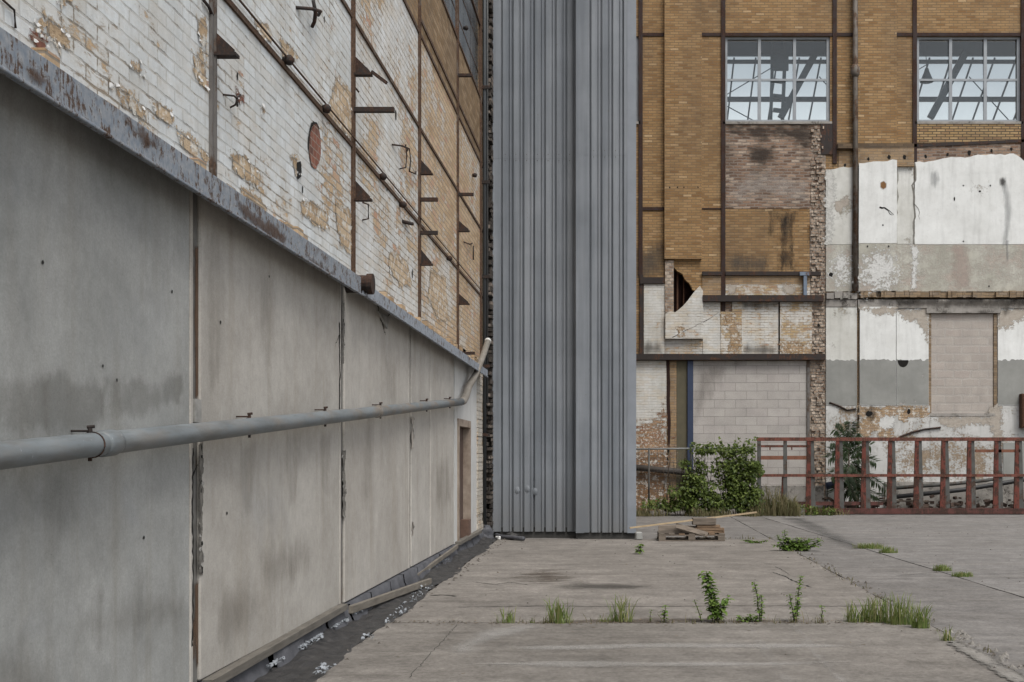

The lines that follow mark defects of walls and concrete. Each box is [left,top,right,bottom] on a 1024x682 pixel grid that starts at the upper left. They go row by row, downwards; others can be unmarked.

peeling [29,0,73,55]
peeling [191,15,210,91]
peeling [251,12,298,62]
rust [127,118,159,146]
peeling [229,149,268,211]
peeling [289,76,352,254]
rust [239,202,286,243]
spalling [674,260,698,292]
spalling [731,125,932,502]
peeling [997,308,1024,330]
peeling [857,403,1005,443]
peeling [636,402,676,511]